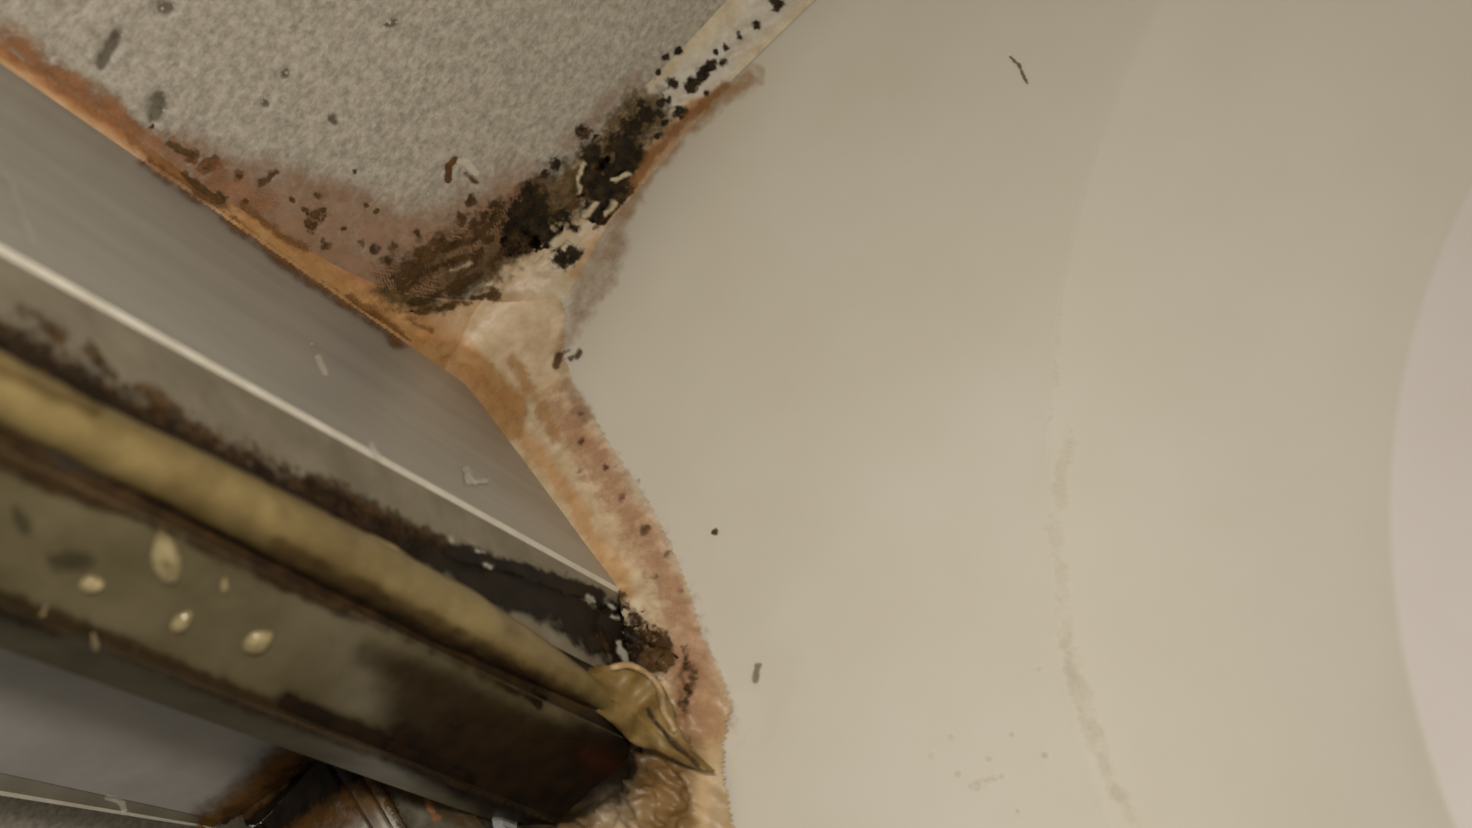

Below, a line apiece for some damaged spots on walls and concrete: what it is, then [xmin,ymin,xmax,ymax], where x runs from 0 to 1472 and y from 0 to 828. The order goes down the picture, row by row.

corrosion [0,33,279,214]
water stain [140,0,784,505]
water stain [0,304,714,825]